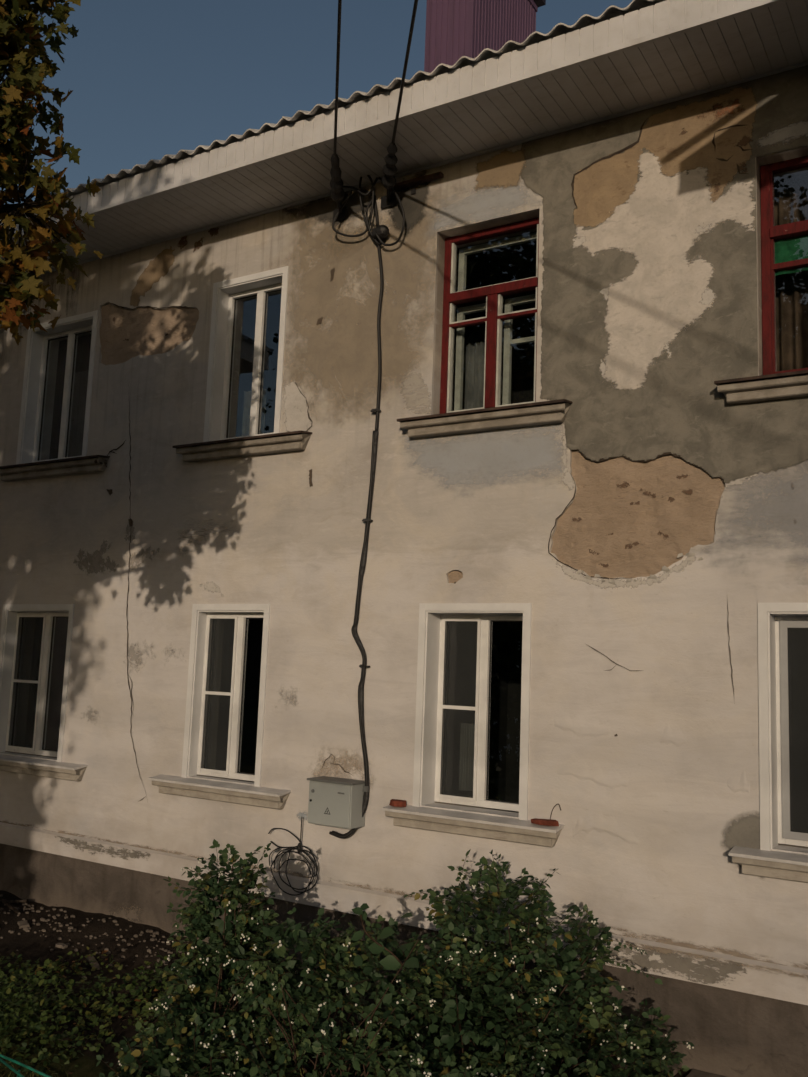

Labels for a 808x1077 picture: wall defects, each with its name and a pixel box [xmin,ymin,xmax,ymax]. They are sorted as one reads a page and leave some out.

peeling [475,149,525,190]
peeling [571,87,757,227]
spalling [99,228,219,365]
spalling [548,422,757,589]
crack [106,403,148,802]
spalling [448,570,463,584]
peeling [55,836,151,860]
peeling [606,944,747,984]